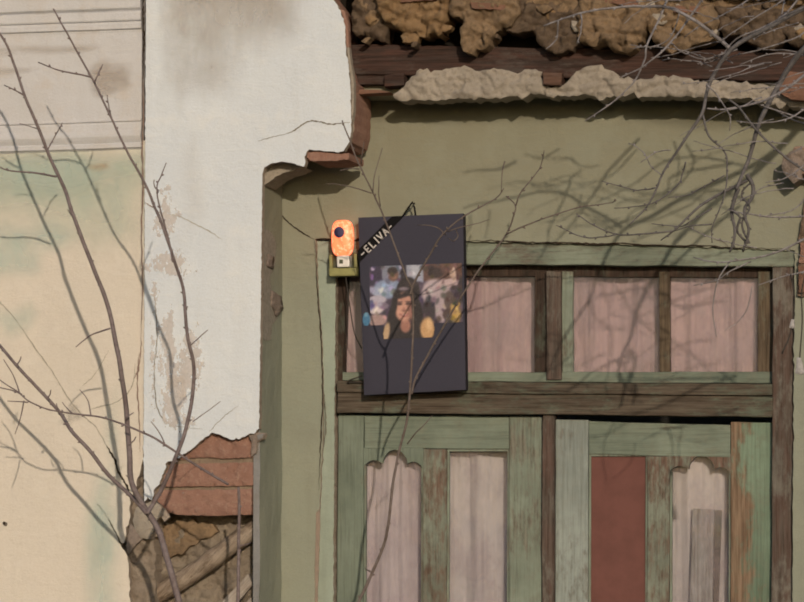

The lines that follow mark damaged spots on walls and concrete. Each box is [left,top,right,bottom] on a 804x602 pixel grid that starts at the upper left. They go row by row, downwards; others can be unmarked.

flaking render [393,64,804,112]
crack [260,120,349,141]
spalling [782,146,804,187]
peeling [153,185,182,237]
crack [0,0,239,503]
peeling [141,250,186,313]
peeling [149,304,205,432]
crack [96,503,127,544]
flaking render [129,433,267,602]